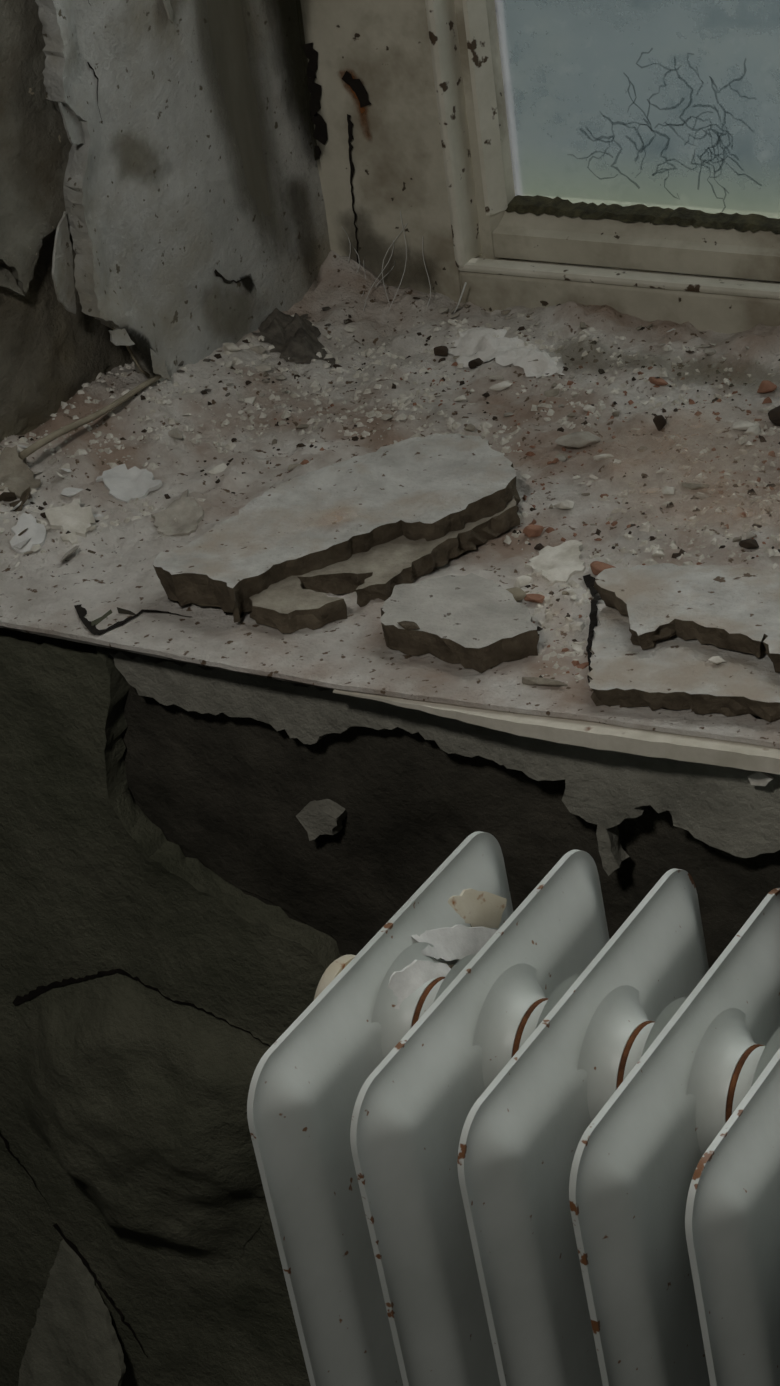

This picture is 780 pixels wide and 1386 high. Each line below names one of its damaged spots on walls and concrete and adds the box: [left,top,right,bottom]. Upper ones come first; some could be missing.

peeling [0,0,108,452]
flaking render [108,326,256,414]
flaking render [289,307,357,375]
flaking render [732,405,776,446]
peeling [0,463,162,531]
flaking render [549,454,622,509]
peeling [13,526,51,568]
peeling [524,540,585,616]
flaking render [109,649,780,1010]